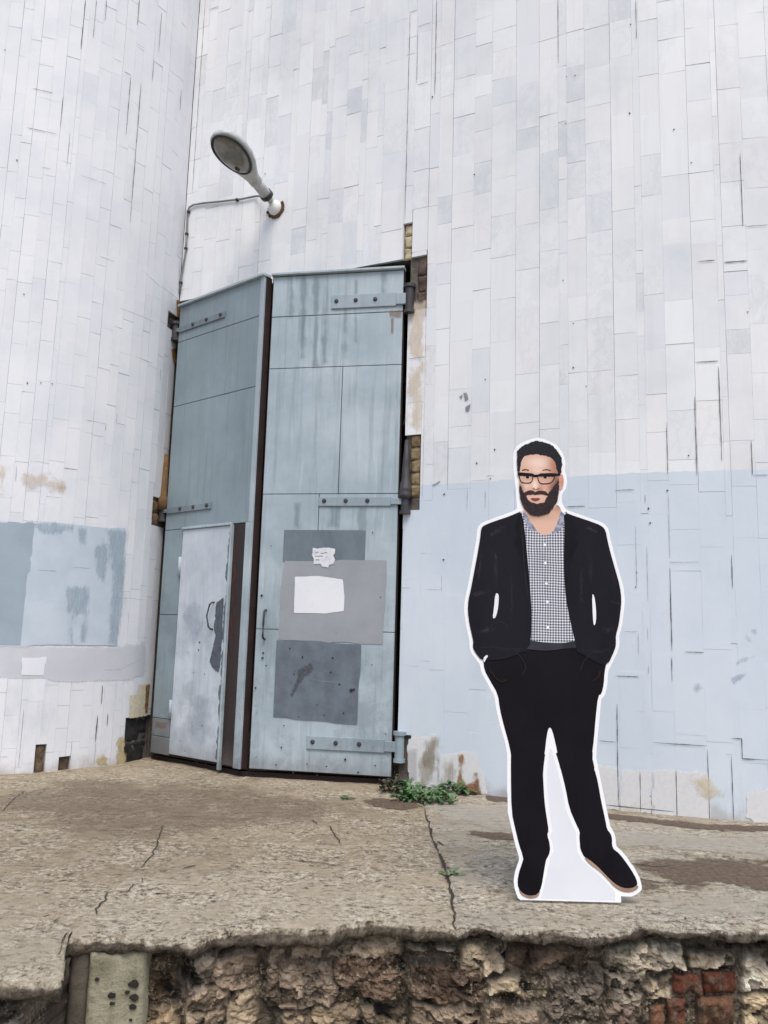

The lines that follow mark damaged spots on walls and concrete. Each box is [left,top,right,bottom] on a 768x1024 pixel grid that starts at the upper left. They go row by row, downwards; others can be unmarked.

spalling [404,225,427,306]
spalling [410,436,421,498]
spalling [124,684,150,762]
spalling [33,745,45,773]
spalling [58,757,68,770]
damp [420,740,436,784]
corrosion [457,755,481,795]
crack [95,815,209,914]
crack [424,809,456,929]